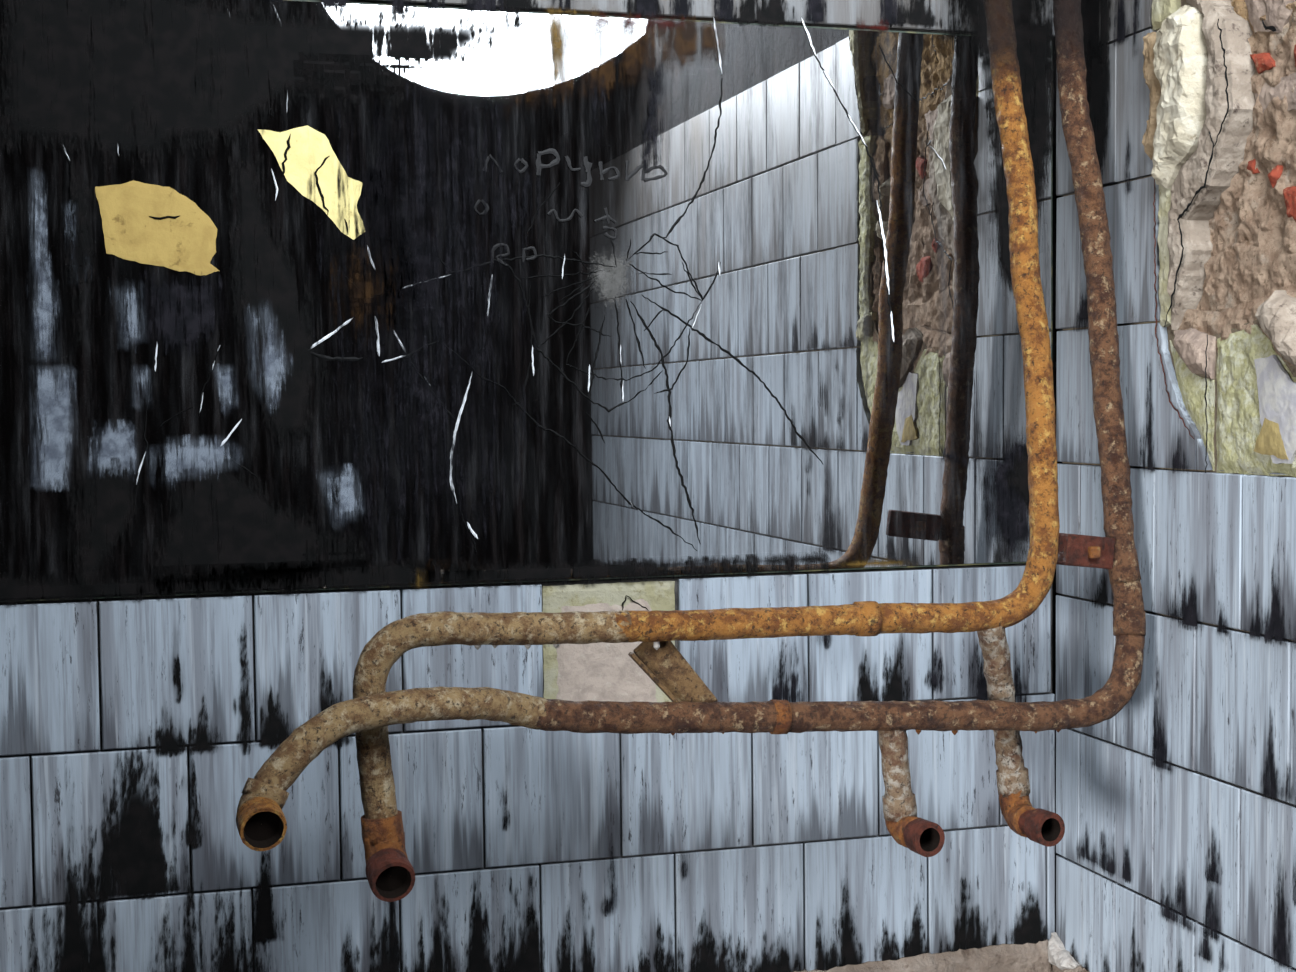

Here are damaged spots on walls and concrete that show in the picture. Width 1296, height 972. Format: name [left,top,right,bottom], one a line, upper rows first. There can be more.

leakage [881,0,942,28]
flaking render [1142,0,1296,478]
leakage [1166,578,1200,631]
leakage [1217,559,1296,644]
leakage [1152,667,1171,772]
leakage [1261,710,1292,803]
spalling [791,932,1090,972]
leakage [1130,920,1144,972]
leakage [1273,855,1296,968]